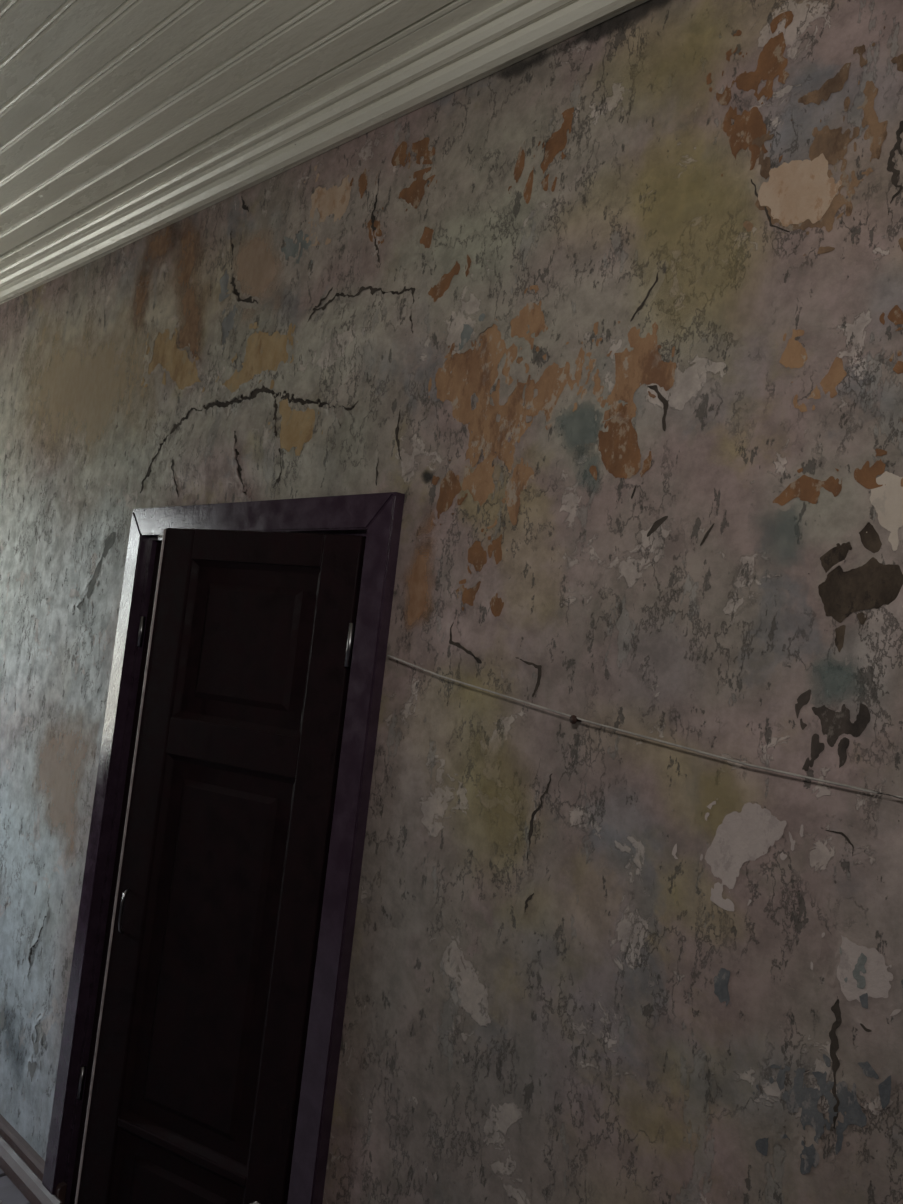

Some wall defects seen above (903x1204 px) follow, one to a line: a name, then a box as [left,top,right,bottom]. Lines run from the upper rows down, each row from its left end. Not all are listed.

peeling [387,130,443,256]
peeling [706,11,903,256]
crack [135,167,422,506]
peeling [424,250,472,309]
peeling [268,387,323,460]
peeling [426,314,676,629]
spalling [763,446,903,669]
peeling [800,918,901,1016]
peeling [743,1052,867,1180]